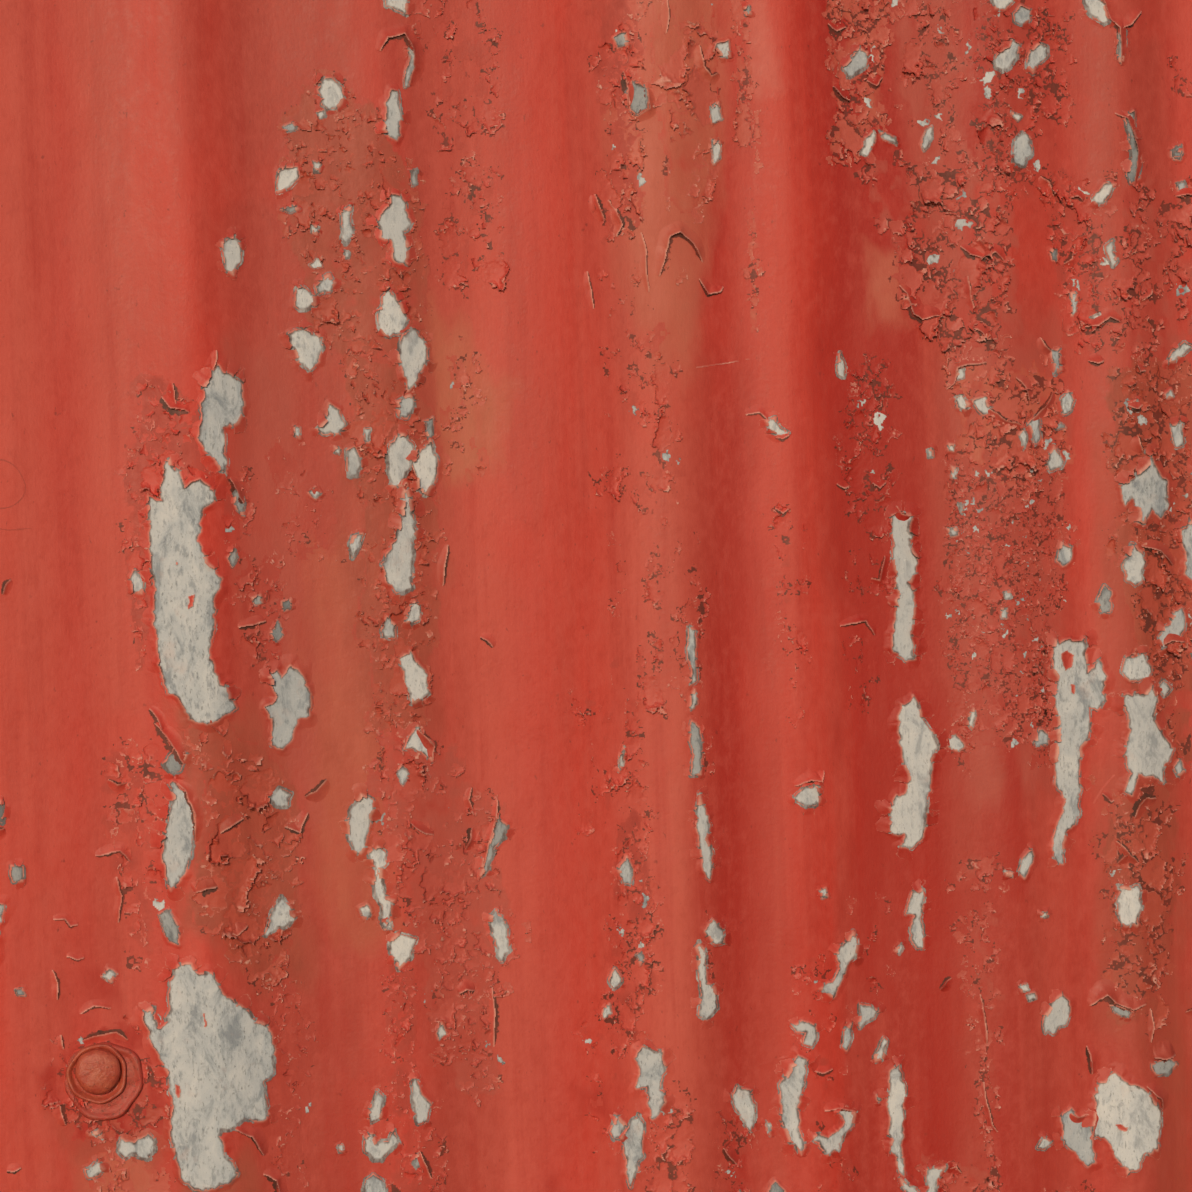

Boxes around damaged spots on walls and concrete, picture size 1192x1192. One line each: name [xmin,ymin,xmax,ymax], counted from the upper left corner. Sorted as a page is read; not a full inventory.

peeling [215,227,247,280]
peeling [584,0,763,529]
peeling [272,0,531,1130]
peeling [710,0,1192,1192]
peeling [0,858,29,978]
peeling [14,984,29,999]
peeling [568,541,722,1192]
peeling [689,909,732,1030]